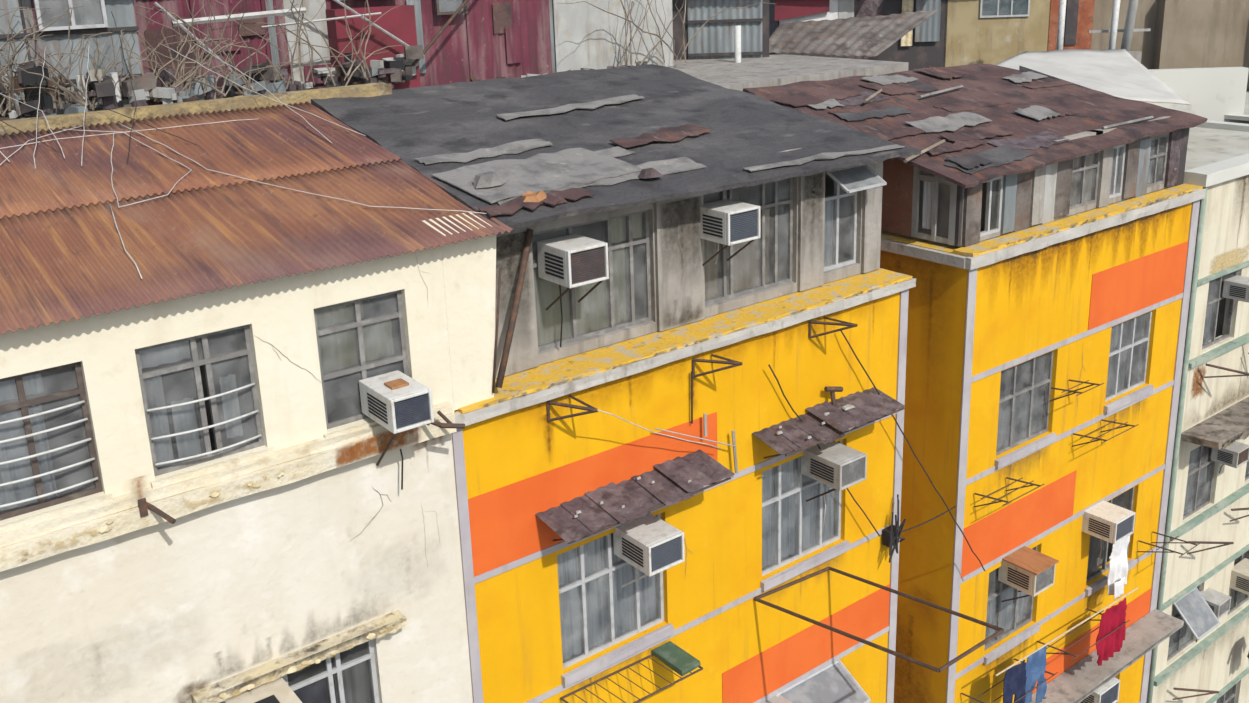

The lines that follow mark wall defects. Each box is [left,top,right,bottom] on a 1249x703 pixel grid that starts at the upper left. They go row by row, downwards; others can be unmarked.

damp [663,197,699,248]
damp [496,231,528,291]
damp [1212,249,1247,273]
crack [257,337,318,380]
corrosion [337,427,419,465]
crack [354,487,391,538]
damp [220,625,386,693]
peeling [285,628,397,674]
peeling [208,680,268,702]